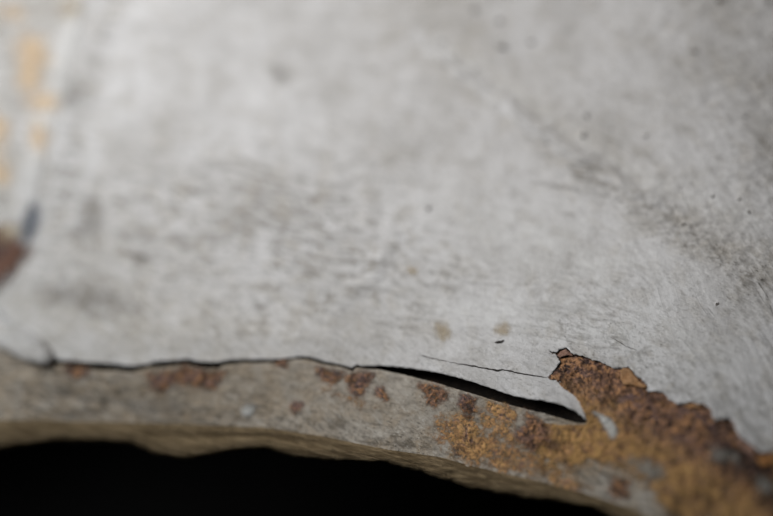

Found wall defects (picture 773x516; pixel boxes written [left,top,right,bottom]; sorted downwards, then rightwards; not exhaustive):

rust [147,364,226,392]
crack [52,355,584,423]
rust [315,366,389,407]
rust [417,383,448,407]
rust [435,394,589,491]
peeling [530,348,773,516]
rust [608,477,630,498]